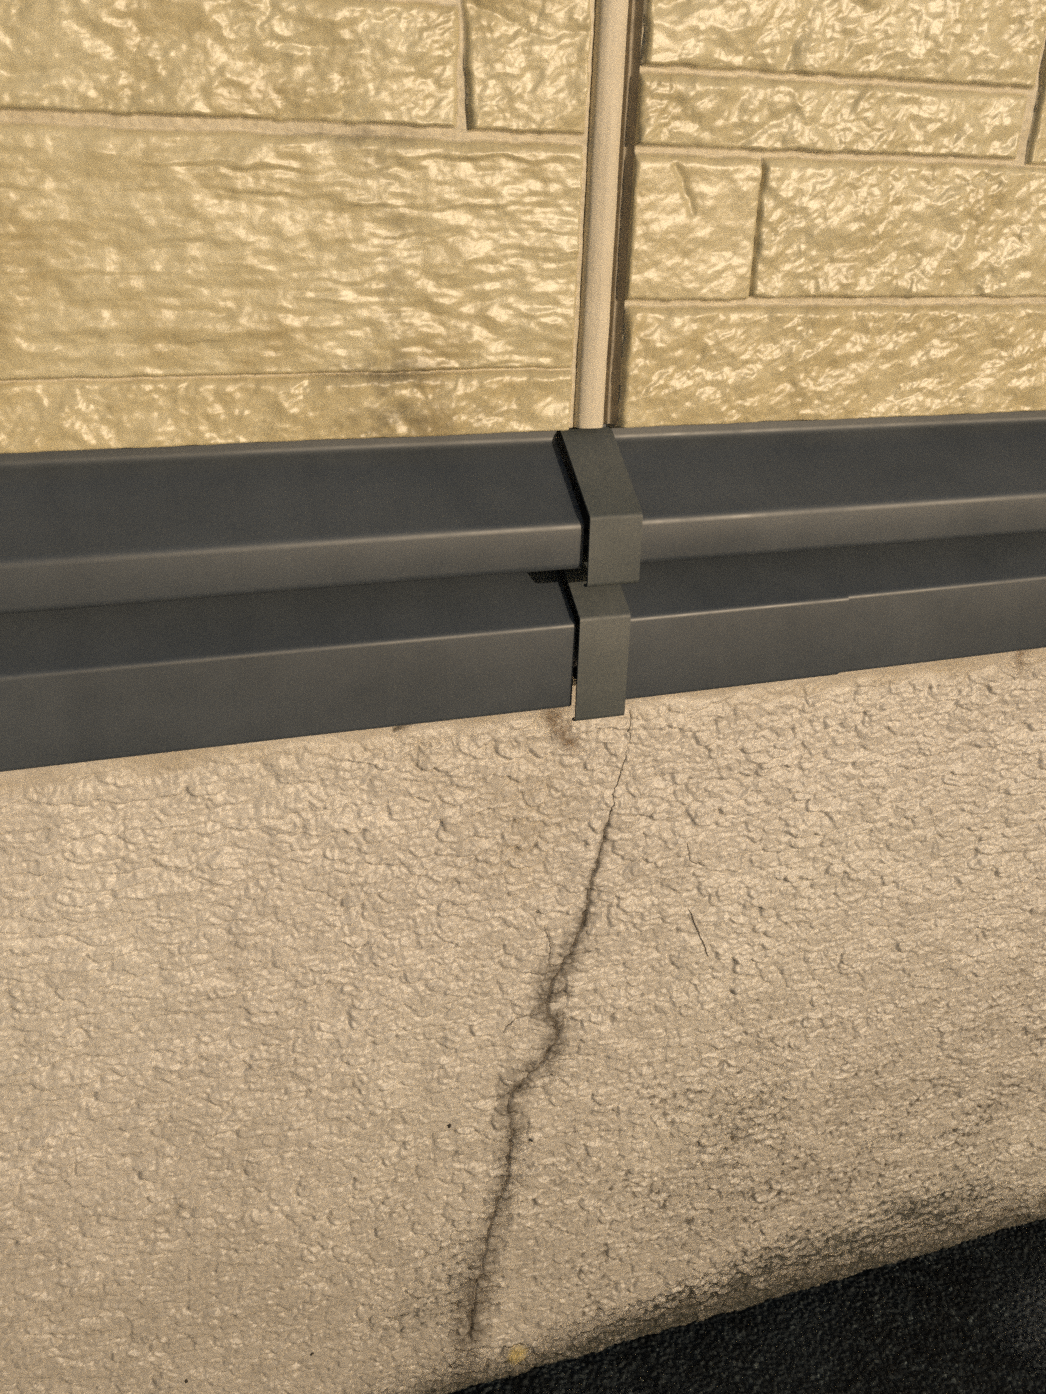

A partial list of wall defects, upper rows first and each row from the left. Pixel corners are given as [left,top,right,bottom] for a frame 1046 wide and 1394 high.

crack [470,709,632,1313]